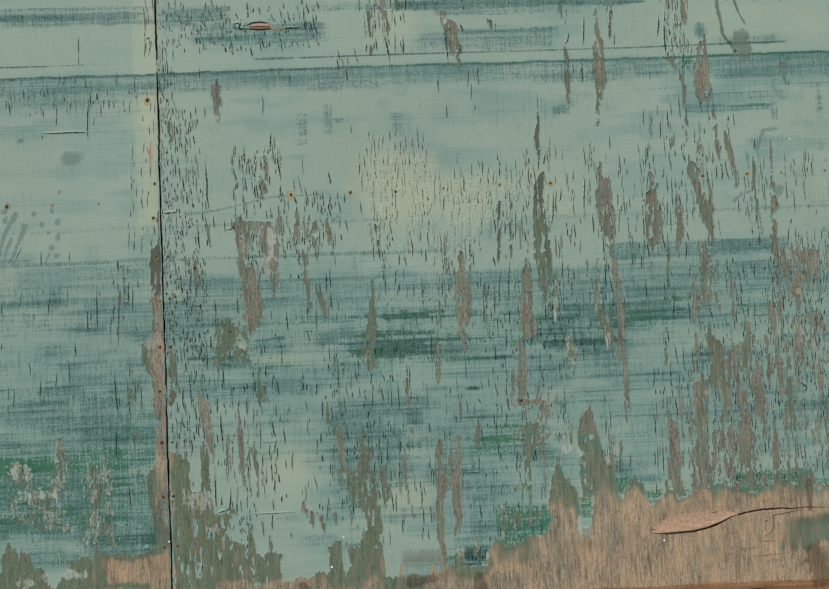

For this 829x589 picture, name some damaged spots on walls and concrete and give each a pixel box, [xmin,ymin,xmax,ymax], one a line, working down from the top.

peeling [562,46,572,107]
peeling [591,4,615,126]
peeling [658,0,717,142]
peeling [783,149,814,211]
peeling [492,111,585,380]
peeling [313,267,334,318]
peeling [419,229,476,361]
peeling [482,282,512,351]
peeling [579,140,638,424]
peeling [427,331,444,386]
peeling [300,479,339,535]
peeling [415,481,431,541]